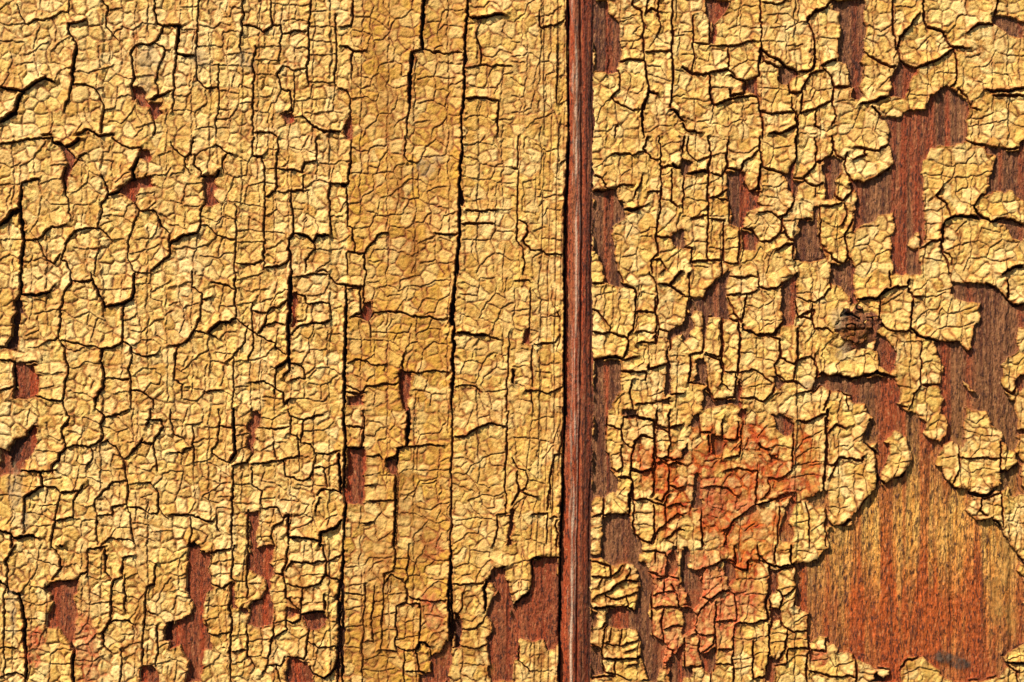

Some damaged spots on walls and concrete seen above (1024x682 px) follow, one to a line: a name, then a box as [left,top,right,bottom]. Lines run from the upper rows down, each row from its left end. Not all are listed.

crack [0,0,569,682]
peeling [589,0,1024,682]
crack [590,0,1024,682]
peeling [327,433,413,517]
peeling [34,564,94,657]
peeling [125,497,357,682]
peeling [405,494,561,682]